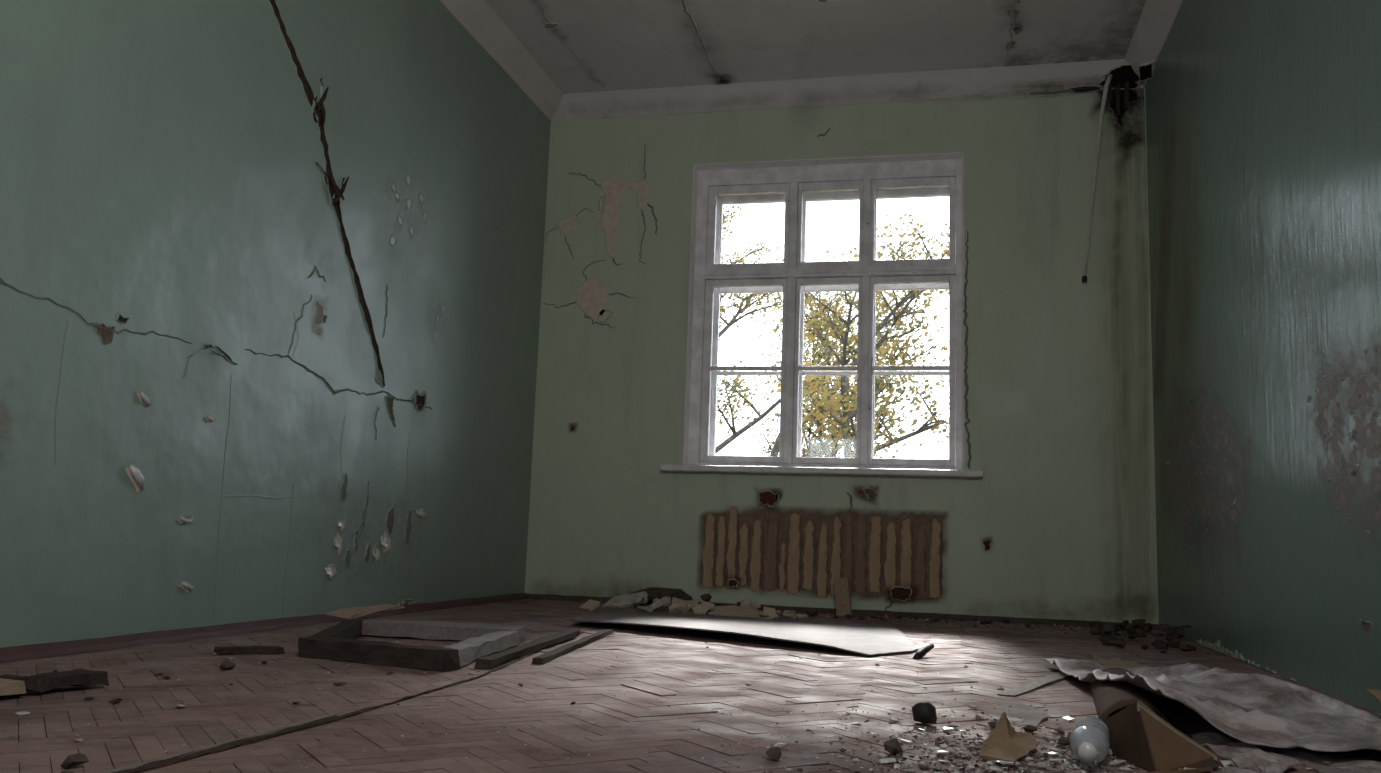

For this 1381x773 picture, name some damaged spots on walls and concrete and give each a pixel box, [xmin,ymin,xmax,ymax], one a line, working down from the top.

crack [681,0,729,85]
crack [0,0,432,619]
peeling [123,463,145,494]
peeling [324,481,427,580]
spalling [758,490,783,509]
peeling [1307,345,1381,535]
spalling [886,586,917,603]